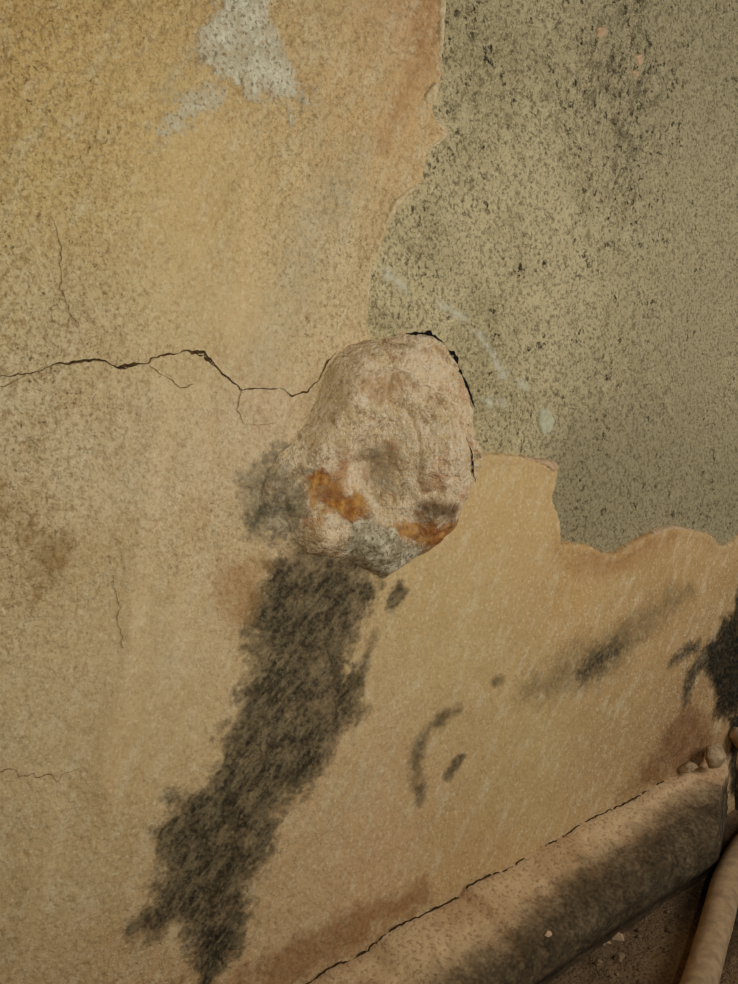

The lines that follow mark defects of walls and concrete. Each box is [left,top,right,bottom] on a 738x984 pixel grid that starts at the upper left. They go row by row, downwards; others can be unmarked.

spalling [364,0,738,553]
crack [1,350,334,425]
rust [307,468,369,523]
spalling [345,515,426,579]
rust [397,502,459,552]
damp [127,442,427,984]
damp [667,597,738,766]
crack [545,781,664,846]
crack [306,858,525,984]